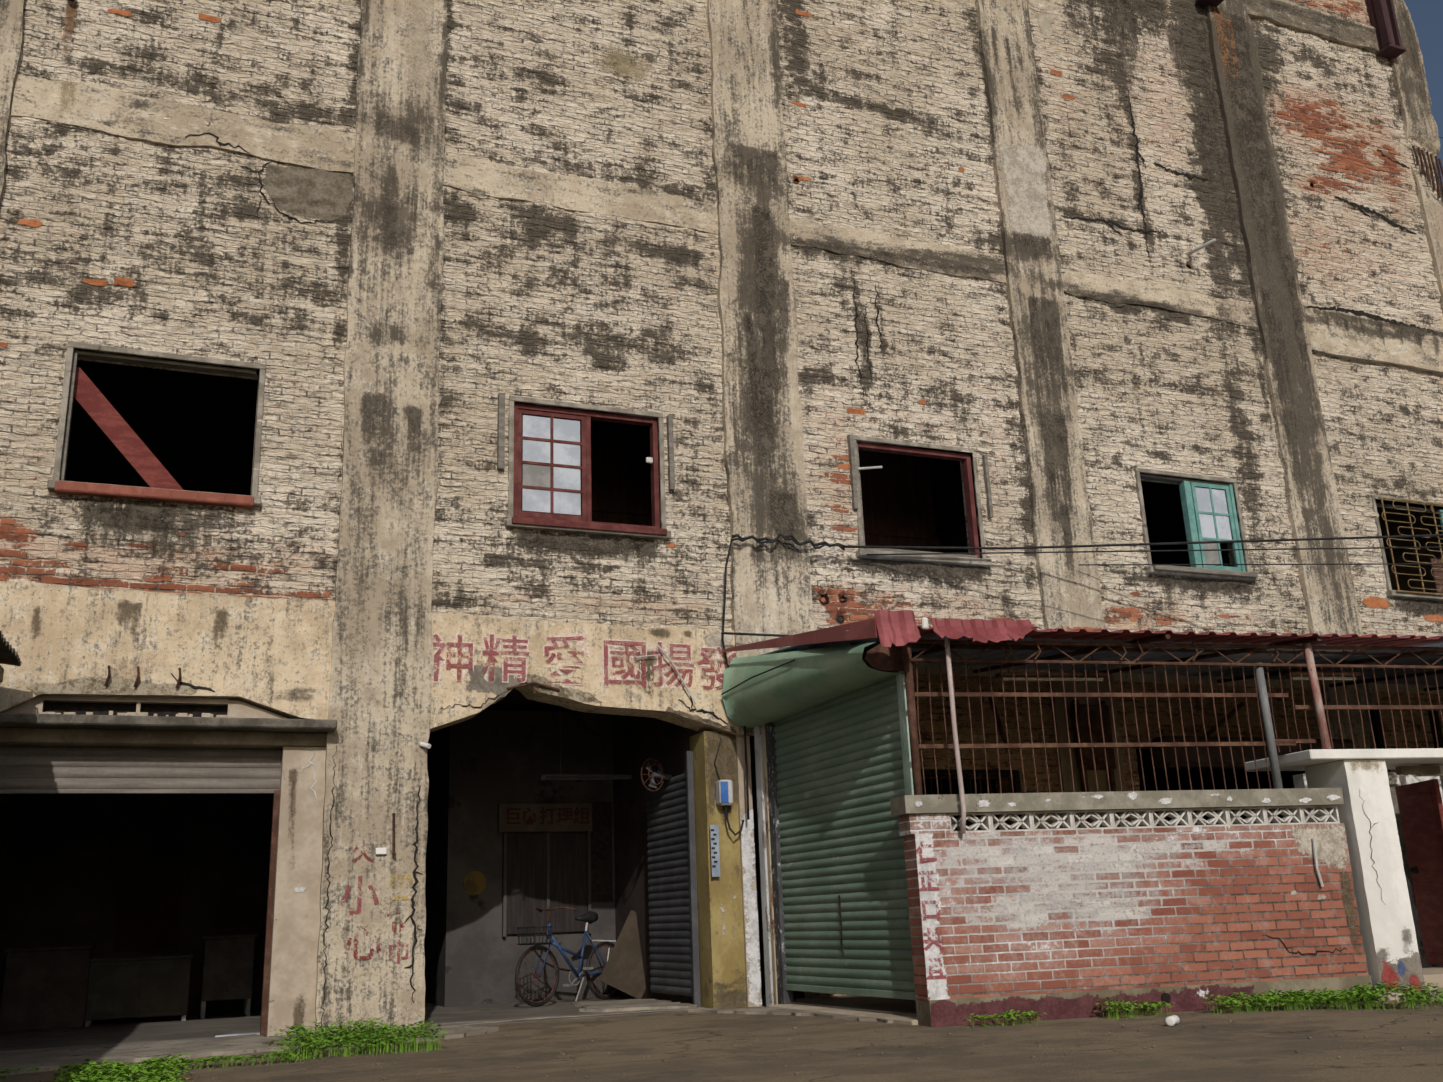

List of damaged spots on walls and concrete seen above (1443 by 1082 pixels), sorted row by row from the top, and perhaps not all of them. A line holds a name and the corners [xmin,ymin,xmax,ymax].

crack [185,133,336,224]
water stain [729,142,778,187]
peeling [1267,96,1443,205]
water stain [1066,0,1443,494]
water stain [742,206,799,584]
water stain [1028,296,1076,584]
peeling [0,514,331,601]
peeling [814,585,875,625]
crack [404,785,423,1003]
peeling [915,827,1259,1027]
peeling [1291,823,1348,869]
crack [1360,797,1384,903]